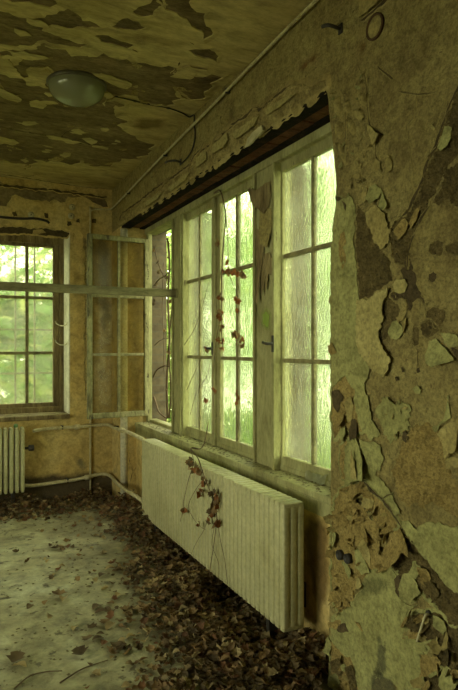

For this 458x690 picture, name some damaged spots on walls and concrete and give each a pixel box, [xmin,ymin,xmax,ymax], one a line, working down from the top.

flaking render [0,0,232,171]
flaking render [118,74,332,225]
flaking render [0,178,110,285]
peeling [323,92,458,690]
damp [307,521,327,606]